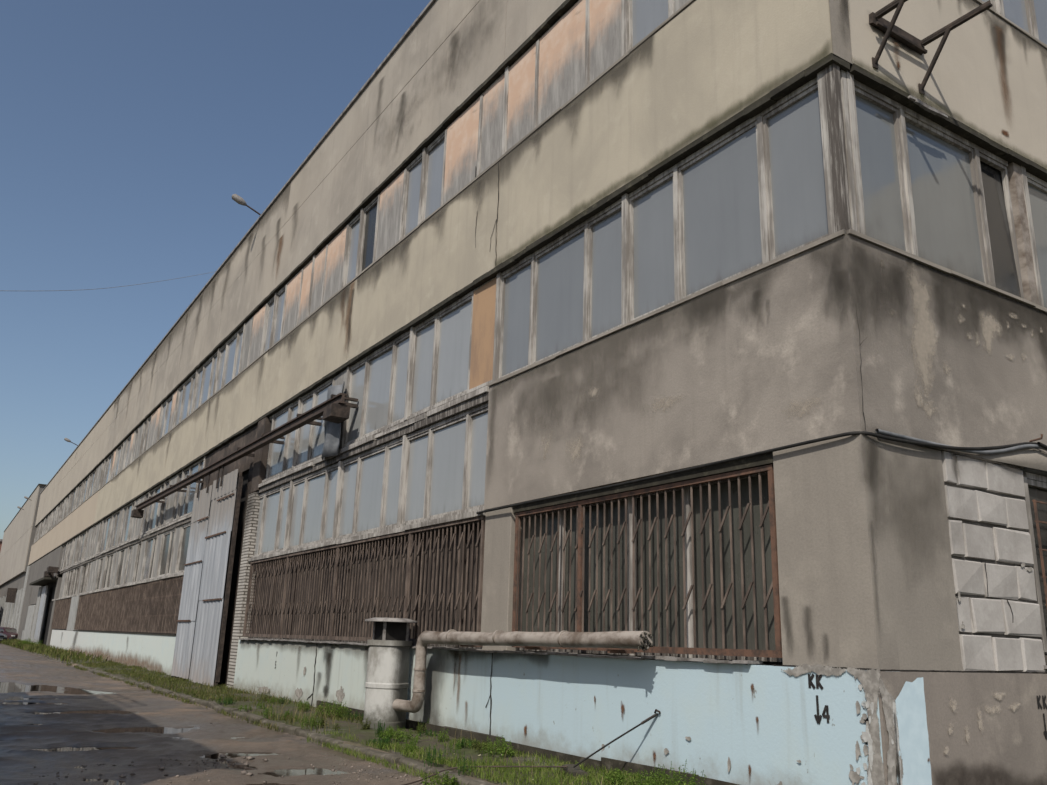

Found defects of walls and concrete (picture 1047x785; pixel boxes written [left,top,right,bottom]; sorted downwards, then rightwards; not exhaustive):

water stain [993,21,1047,99]
water stain [112,35,652,480]
water stain [493,287,723,391]
peeling [781,664,903,785]
water stain [937,766,1047,785]